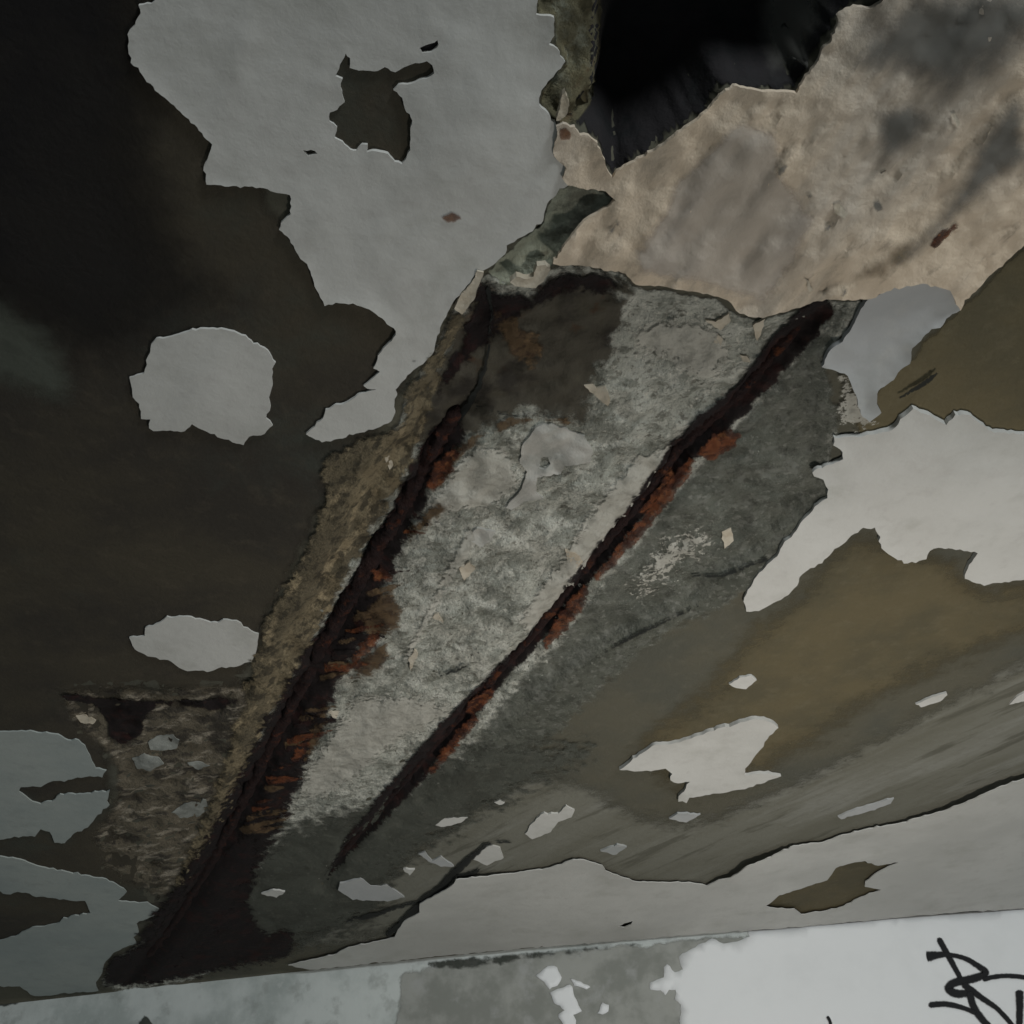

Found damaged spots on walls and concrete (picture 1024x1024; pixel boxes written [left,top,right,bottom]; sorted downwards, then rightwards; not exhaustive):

rust [61,694,238,744]
peeling [0,66,396,996]
rust [102,423,484,989]
peeling [128,0,849,860]
water stain [398,267,634,528]
water stain [245,318,876,959]
rust [327,299,834,880]
peeling [289,250,1024,1024]
water stain [639,126,812,300]
water stain [883,111,924,150]
water stain [866,0,1024,80]
water stain [947,105,1024,219]